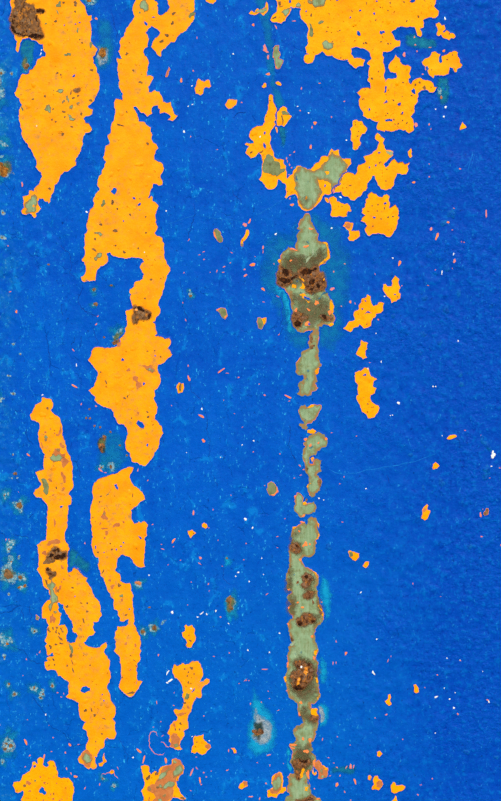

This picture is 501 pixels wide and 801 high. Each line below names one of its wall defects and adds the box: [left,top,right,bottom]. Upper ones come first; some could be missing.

peeling [8,0,102,220]
peeling [28,0,218,801]
peeling [243,0,464,801]
peeling [11,755,76,801]
corrosion [248,695,275,755]